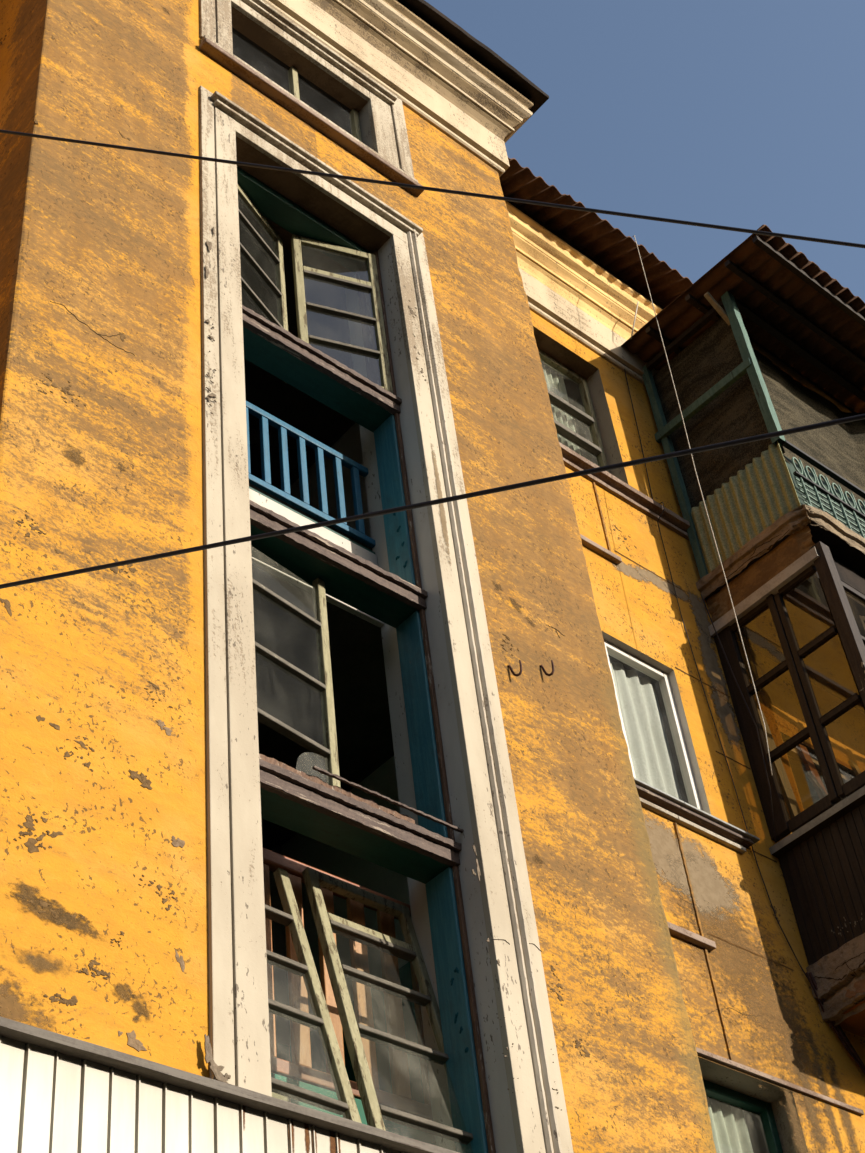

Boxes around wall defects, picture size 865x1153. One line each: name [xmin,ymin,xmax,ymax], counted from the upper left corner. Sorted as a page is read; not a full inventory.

crack [50,301,135,356]
peeling [144,681,173,736]
peeling [36,715,95,772]
peeling [128,769,153,790]
peeling [13,814,66,853]
flaking render [171,836,185,848]
peeling [133,874,176,911]
peeling [43,993,78,1006]
peeling [78,960,111,980]
peeling [550,955,564,1015]
crack [814,952,865,980]
peeling [118,1030,147,1052]